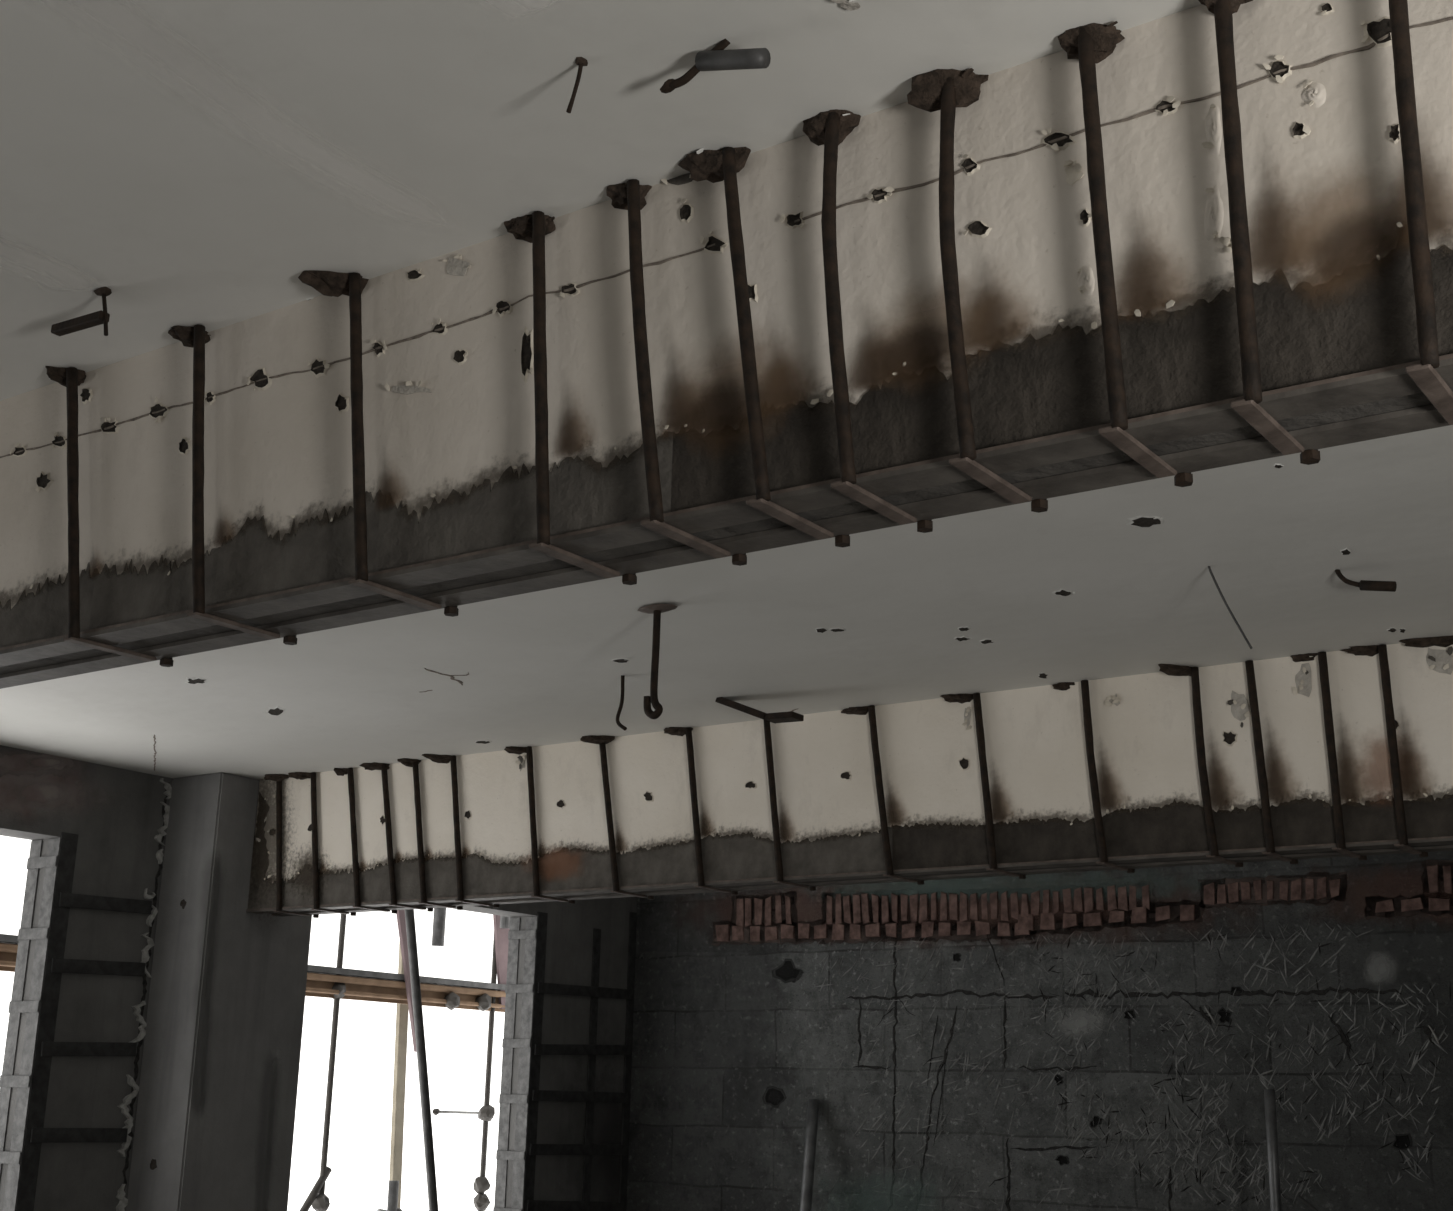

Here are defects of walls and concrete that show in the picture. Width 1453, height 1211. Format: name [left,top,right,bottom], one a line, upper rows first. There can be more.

spalling [961,154,981,176]
spalling [1041,128,1084,185]
spalling [1292,122,1311,139]
spalling [1388,124,1400,144]
spalling [661,173,694,223]
spalling [780,212,805,229]
spalling [867,187,894,204]
spalling [1080,208,1092,227]
peeling [1430,229,1453,356]
peeling [0,220,1420,648]
flaking render [247,789,1453,983]
crack [846,936,1402,1211]